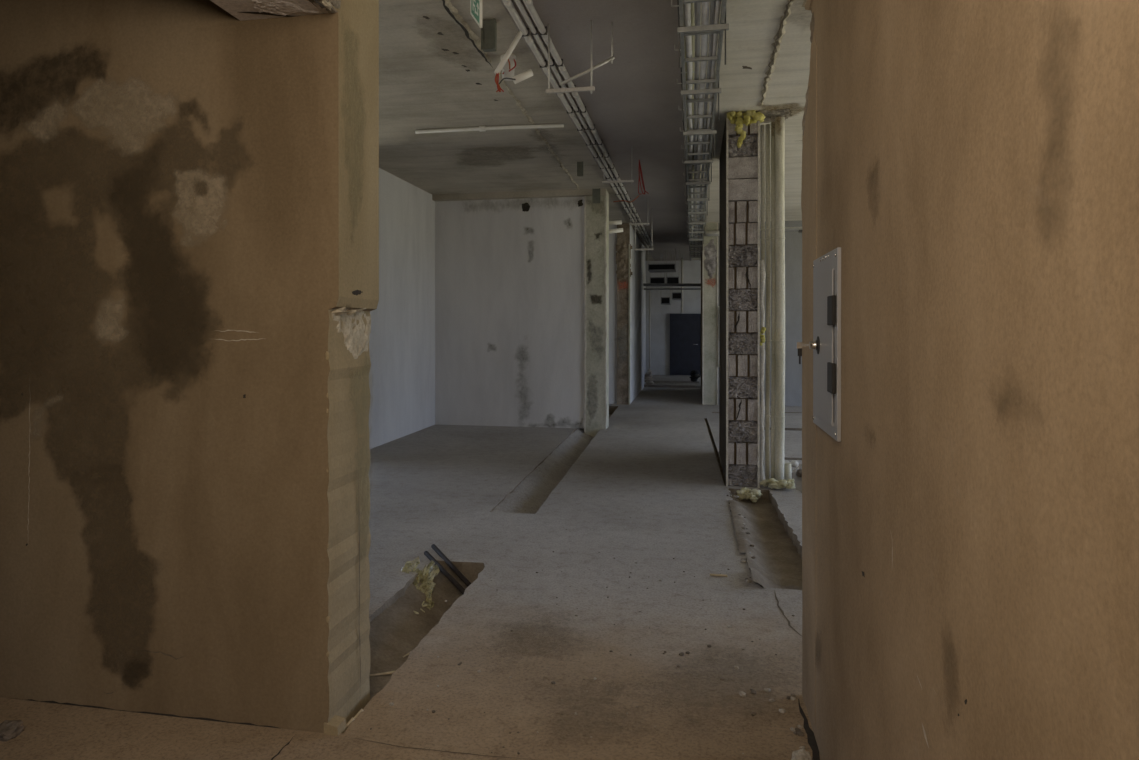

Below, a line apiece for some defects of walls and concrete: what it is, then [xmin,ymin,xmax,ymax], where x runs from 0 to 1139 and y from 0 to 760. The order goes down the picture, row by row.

spalling [251,0,341,15]
crack [442,0,493,68]
water stain [0,47,106,131]
spalling [330,307,371,359]
water stain [0,104,248,687]